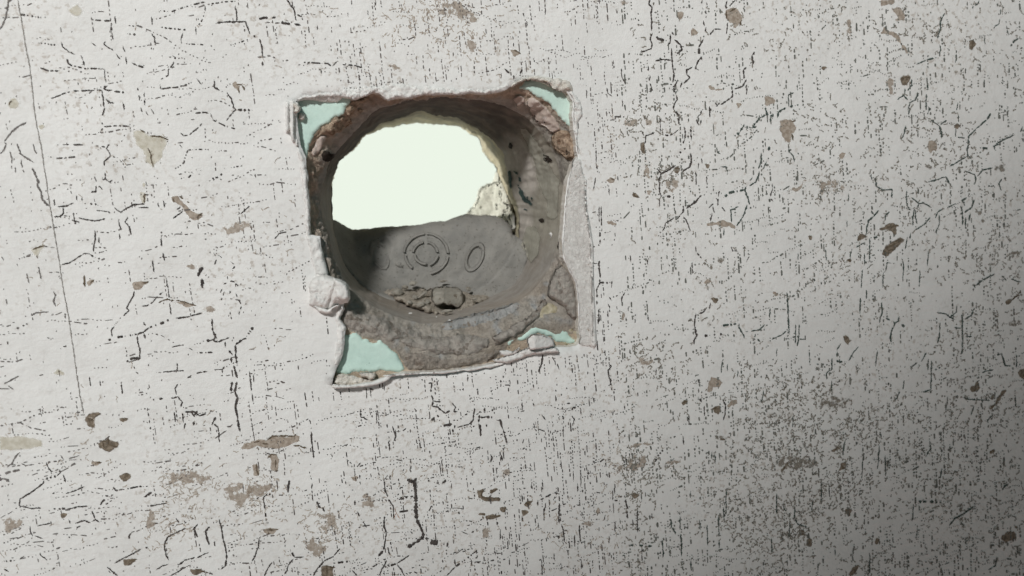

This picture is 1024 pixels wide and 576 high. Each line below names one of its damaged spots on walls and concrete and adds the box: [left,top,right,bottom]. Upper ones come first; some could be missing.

crack [0,0,41,30]
crack [37,0,348,319]
peeling [779,119,796,142]
crack [0,120,169,283]
peeling [171,196,202,220]
spalling [306,80,577,389]
peeling [880,223,904,256]
crack [0,263,123,348]
crack [123,254,207,381]
crack [1,406,69,442]
peeling [85,412,101,428]
peeling [224,434,306,507]